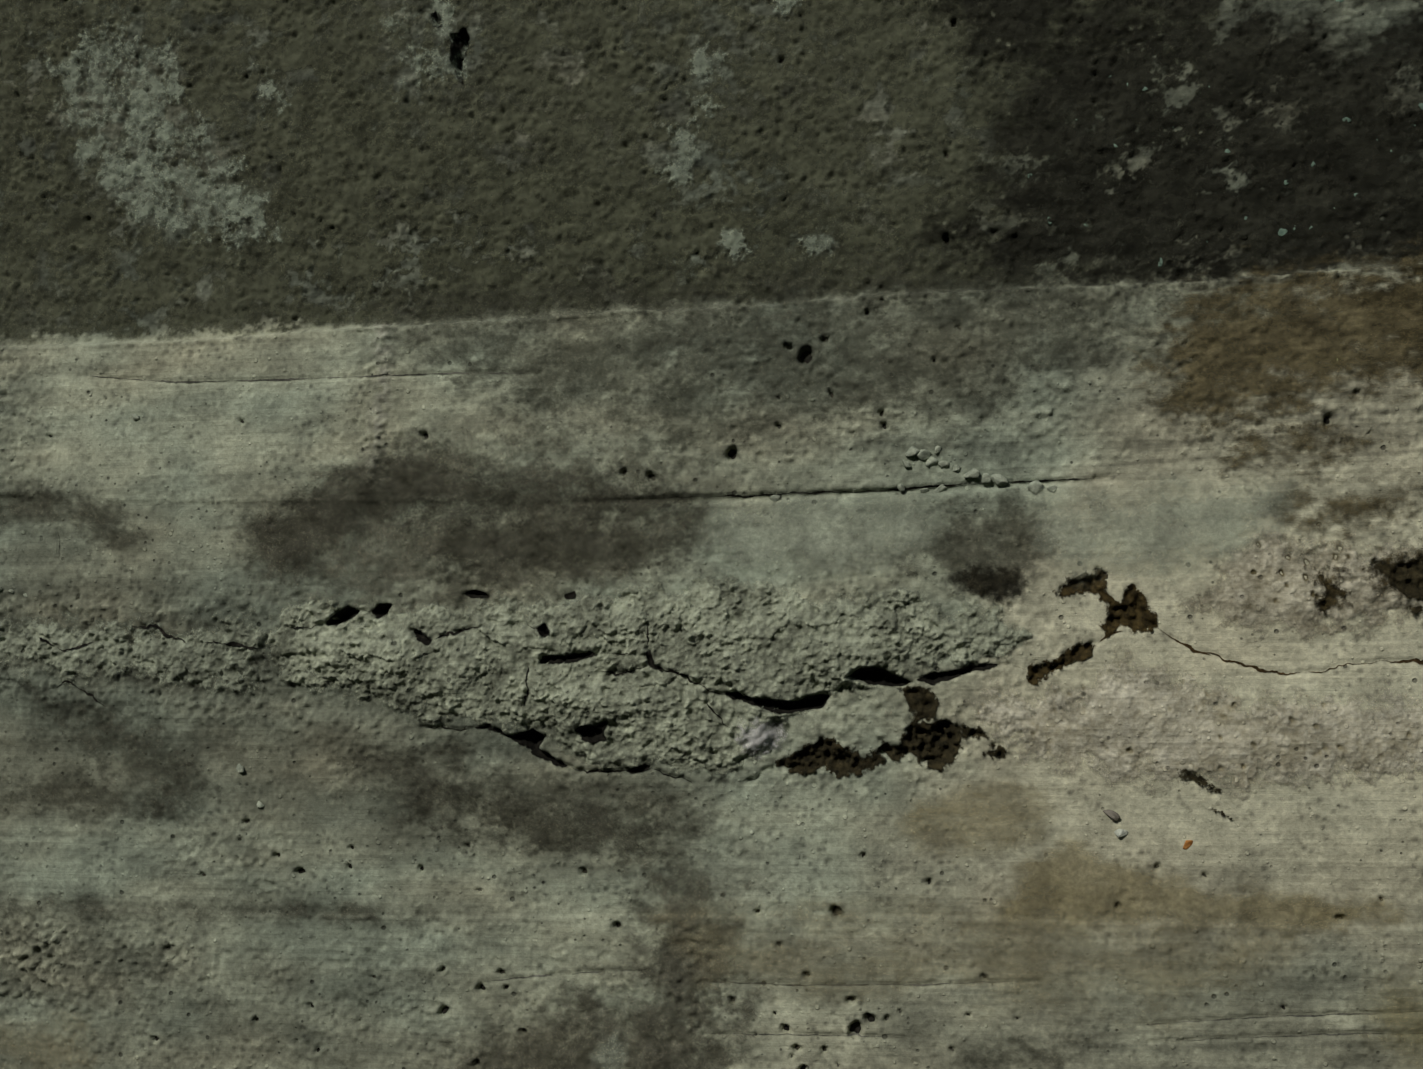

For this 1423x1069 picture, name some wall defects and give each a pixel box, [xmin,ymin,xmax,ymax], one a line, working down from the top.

leakage [1219,421,1374,471]
leakage [246,434,1281,600]
crack [6,624,322,707]
crack [412,607,481,639]
crack [602,616,728,727]
spalling [1026,567,1158,685]
crack [1158,628,1423,675]
spalling [1314,574,1344,615]
spalling [1371,556,1423,614]
spalling [725,692,830,714]
spalling [775,663,1006,779]
crack [572,767,692,783]